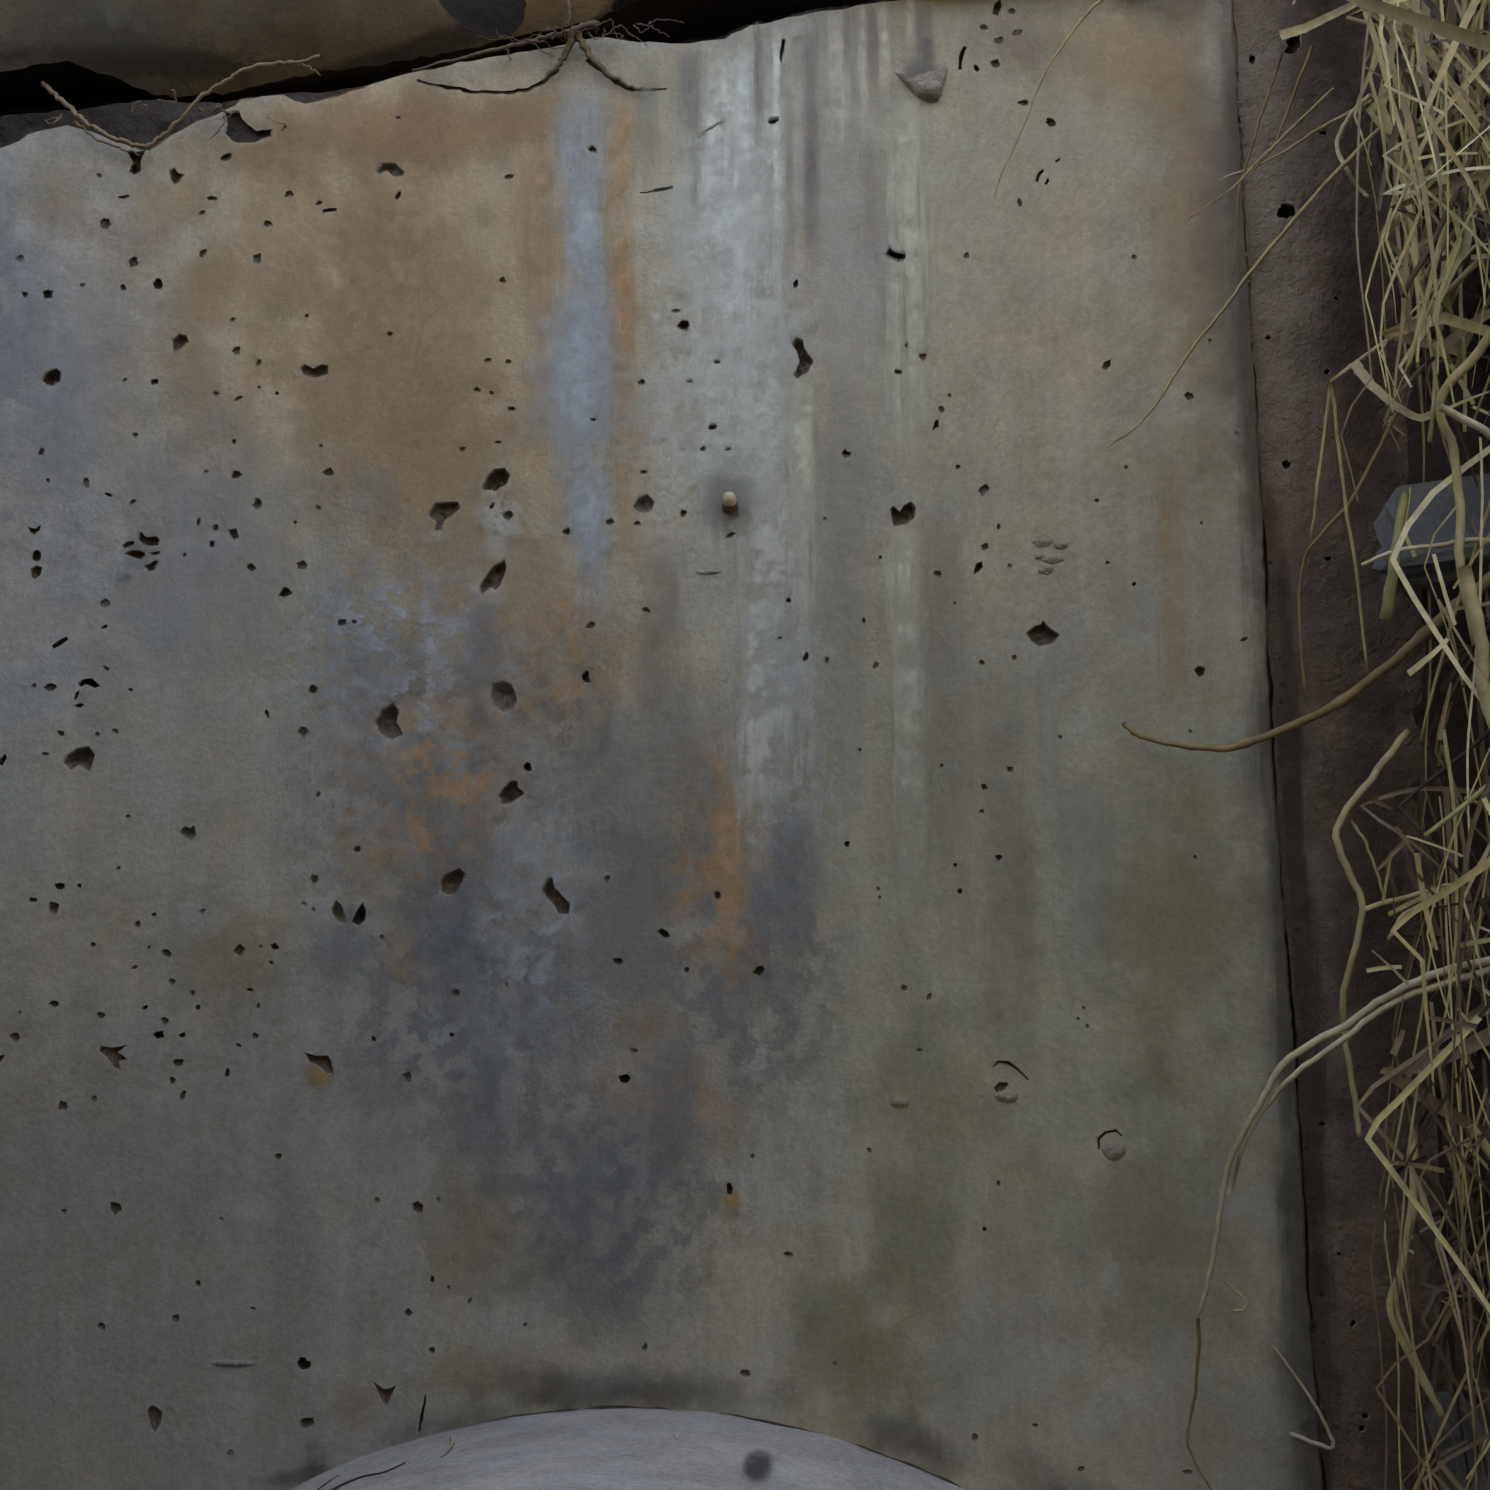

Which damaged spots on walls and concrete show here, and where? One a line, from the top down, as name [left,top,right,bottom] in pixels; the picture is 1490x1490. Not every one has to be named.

spalling [222,110,275,144]
water stain [558,318,600,429]
water stain [683,27,780,446]
water stain [793,405,812,494]
water stain [806,117,815,189]
water stain [904,179,920,382]
water stain [307,572,484,824]
water stain [723,507,824,875]
water stain [895,667,926,841]
water stain [400,800,595,1082]